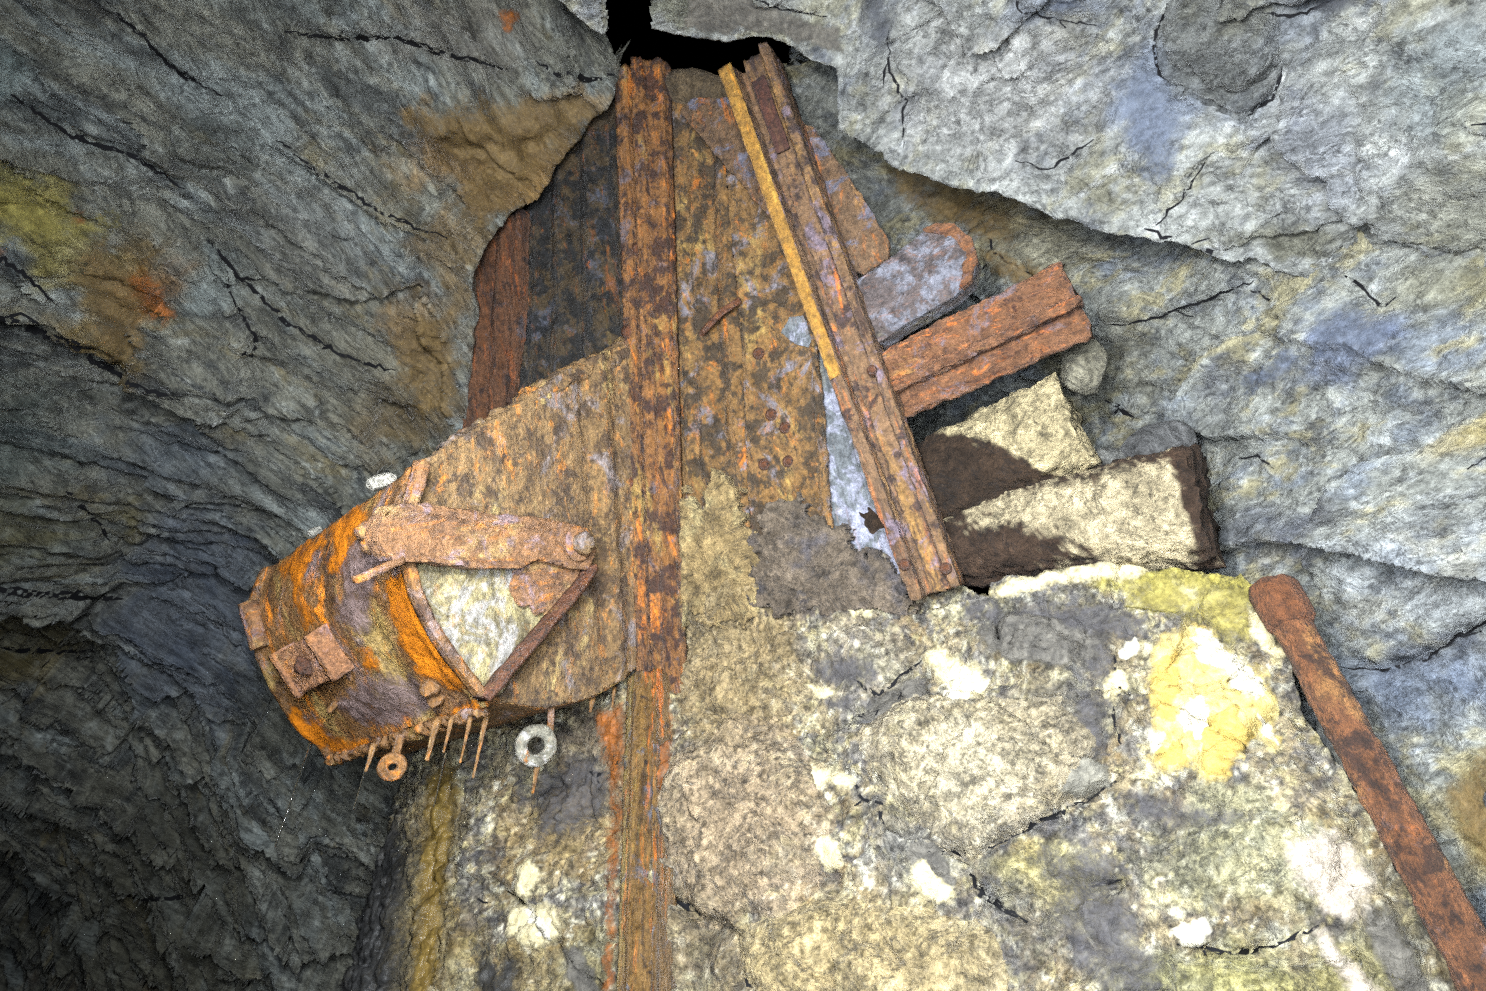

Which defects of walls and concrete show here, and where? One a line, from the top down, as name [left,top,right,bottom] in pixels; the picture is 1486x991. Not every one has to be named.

crack [1262,0,1331,19]
crack [1015,139,1094,170]
crack [1144,162,1214,255]
crack [981,220,1031,275]
crack [1104,280,1270,326]
rust [280,505,366,623]
rust [363,648,378,669]
rust [386,573,483,714]
rust [287,707,368,752]
rust [596,708,621,869]